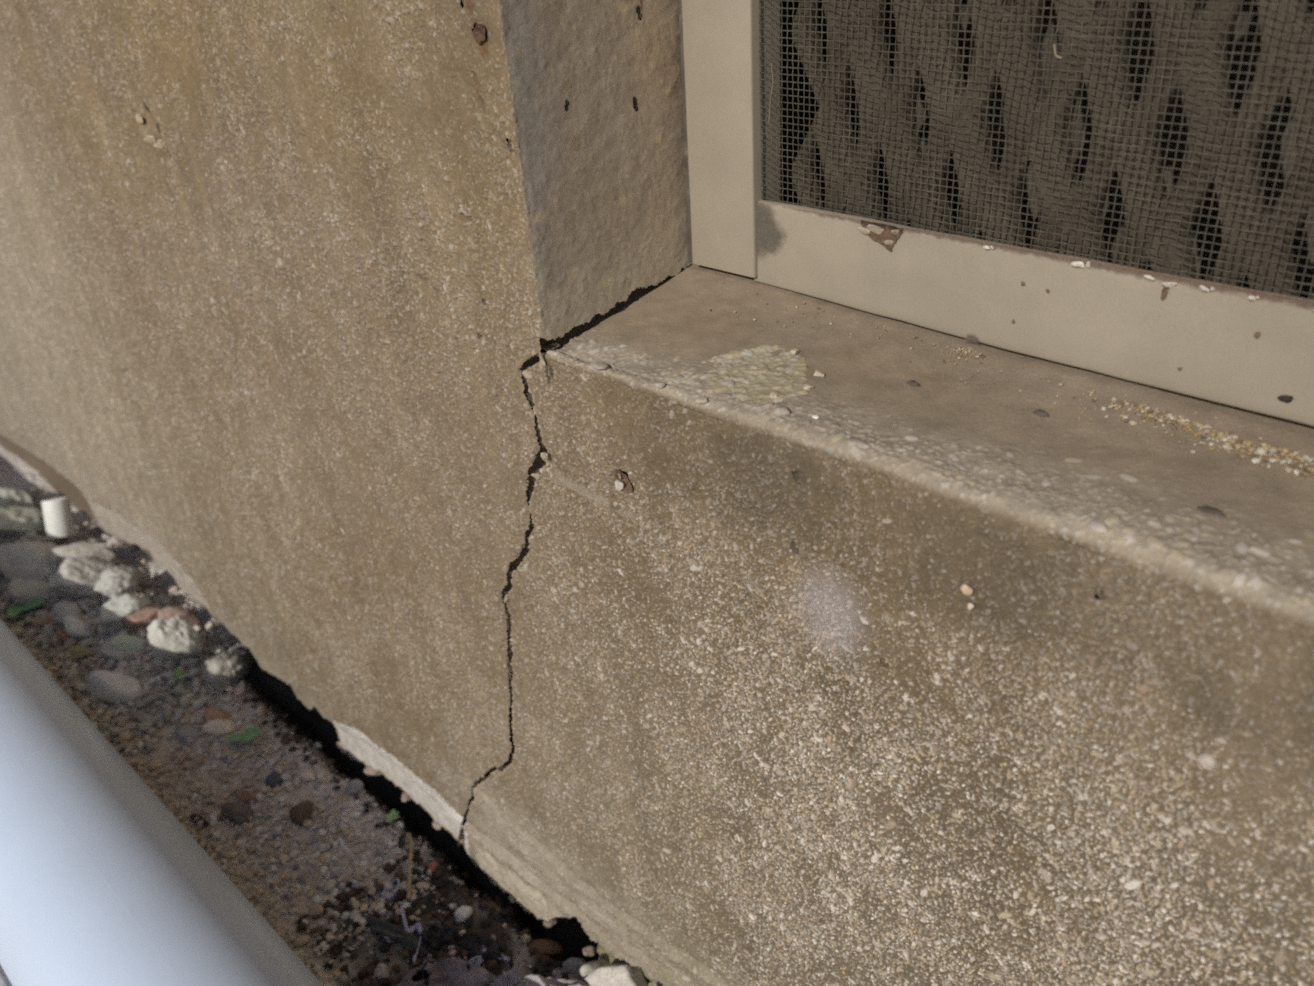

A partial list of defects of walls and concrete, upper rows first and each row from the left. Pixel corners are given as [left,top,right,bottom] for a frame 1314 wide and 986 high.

peeling [857,220,903,252]
crack [458,268,684,848]